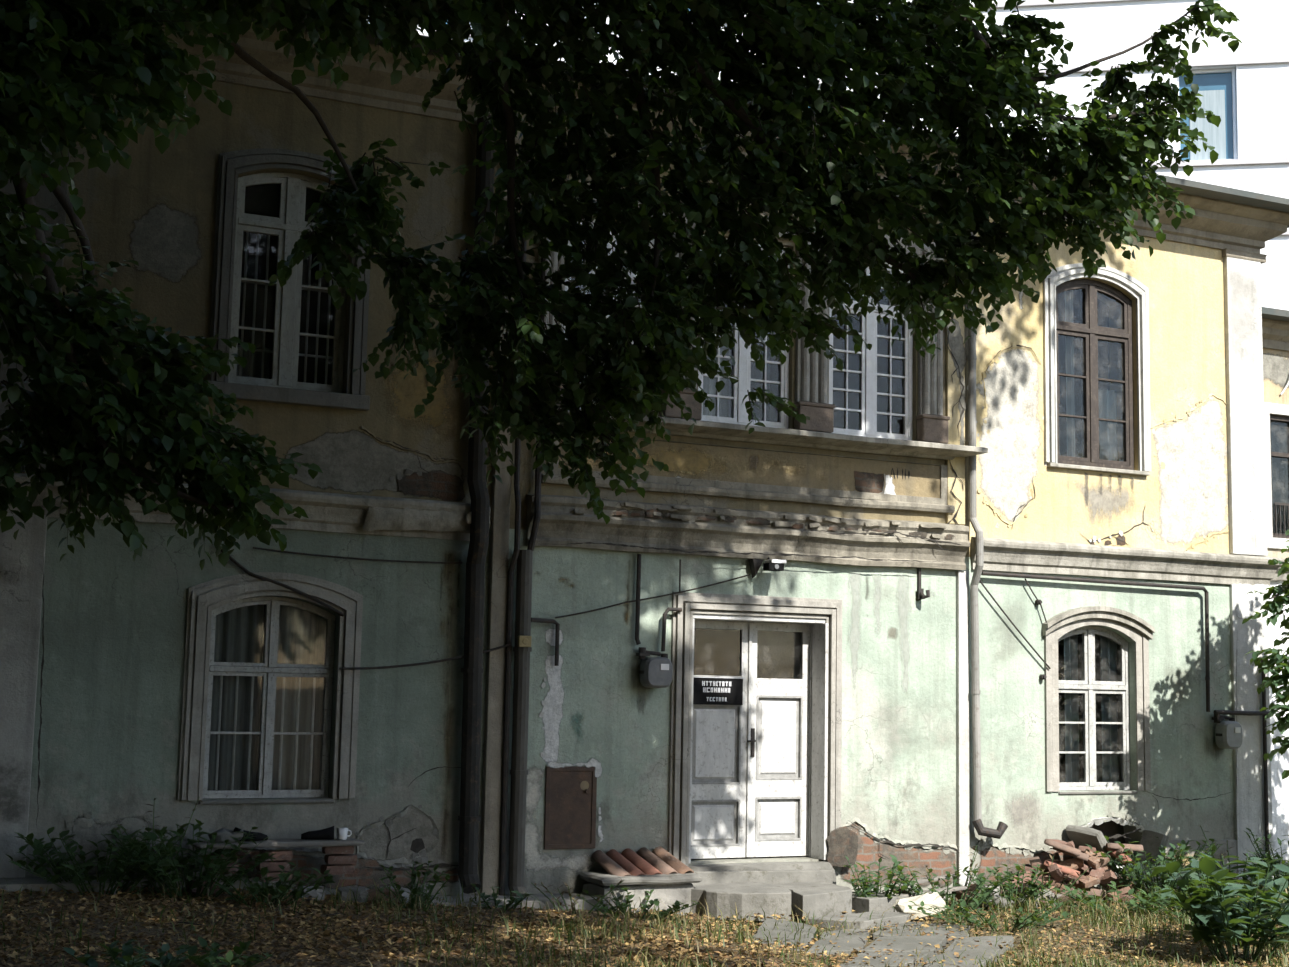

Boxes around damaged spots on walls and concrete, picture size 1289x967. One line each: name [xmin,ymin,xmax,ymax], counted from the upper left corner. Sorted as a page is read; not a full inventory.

flaking render [1263,353,1289,388]
flaking render [946,319,1047,529]
spalling [603,489,954,540]
water stain [1081,473,1134,519]
flaking render [1151,393,1230,552]
crack [366,816,458,871]
flaking render [525,768,593,872]
spalling [827,817,958,888]
spalling [977,839,1073,886]
spalling [1081,814,1146,869]